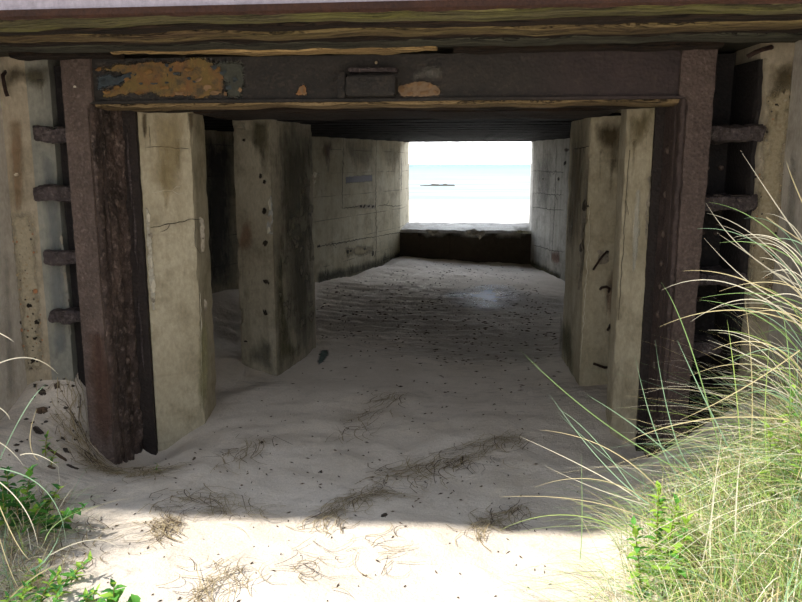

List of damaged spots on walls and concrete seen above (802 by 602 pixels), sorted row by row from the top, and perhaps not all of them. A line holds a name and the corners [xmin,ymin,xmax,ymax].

peeling [96,57,244,99]
peeling [398,81,440,97]
damp [599,126,619,167]